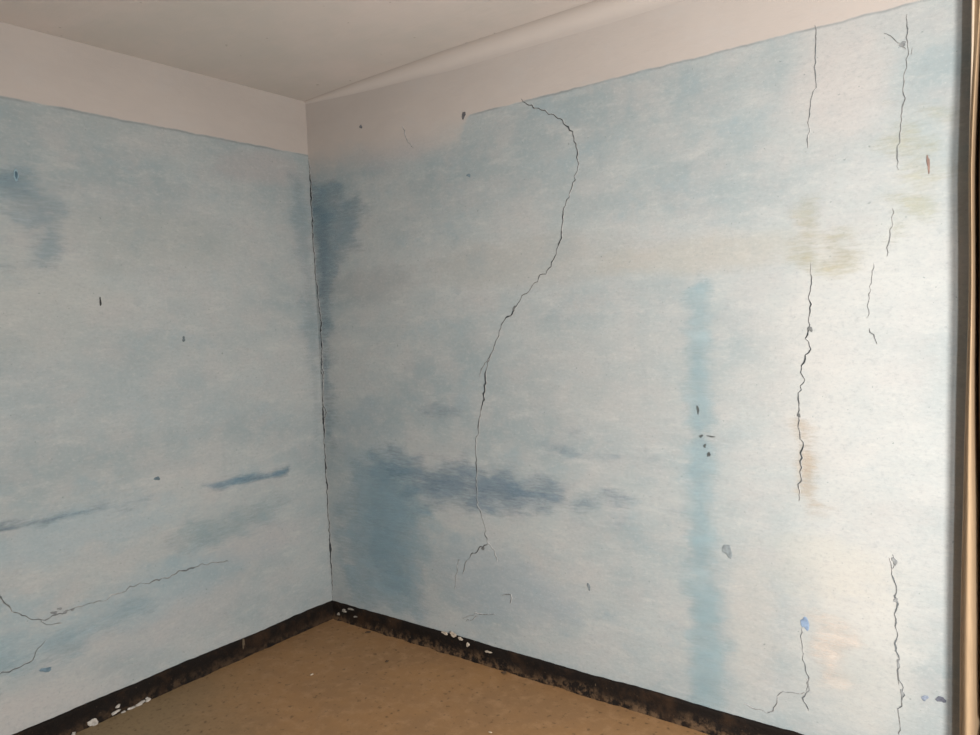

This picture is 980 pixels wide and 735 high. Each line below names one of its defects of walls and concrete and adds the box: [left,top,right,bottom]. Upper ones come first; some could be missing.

crack [807,25,817,148]
crack [884,15,913,170]
crack [455,99,579,587]
crack [797,263,813,500]
crack [867,208,894,344]
crack [0,560,227,674]
crack [745,628,810,713]
crack [889,555,906,735]